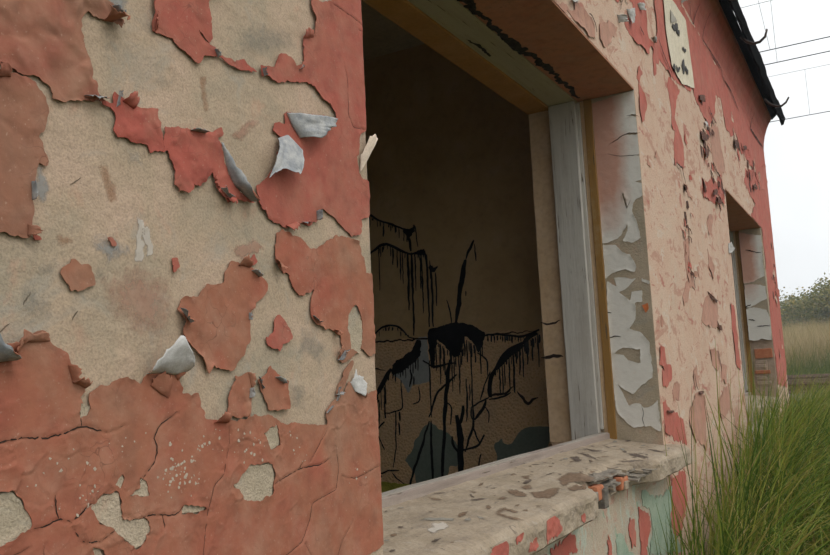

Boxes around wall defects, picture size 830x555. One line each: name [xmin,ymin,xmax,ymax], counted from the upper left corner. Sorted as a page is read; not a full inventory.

peeling [554,0,787,451]
peeling [0,0,384,555]
crack [0,420,101,443]
crack [141,412,176,481]
crack [34,495,182,543]
crack [275,433,378,555]
peeling [491,516,578,555]
peeling [588,464,688,555]